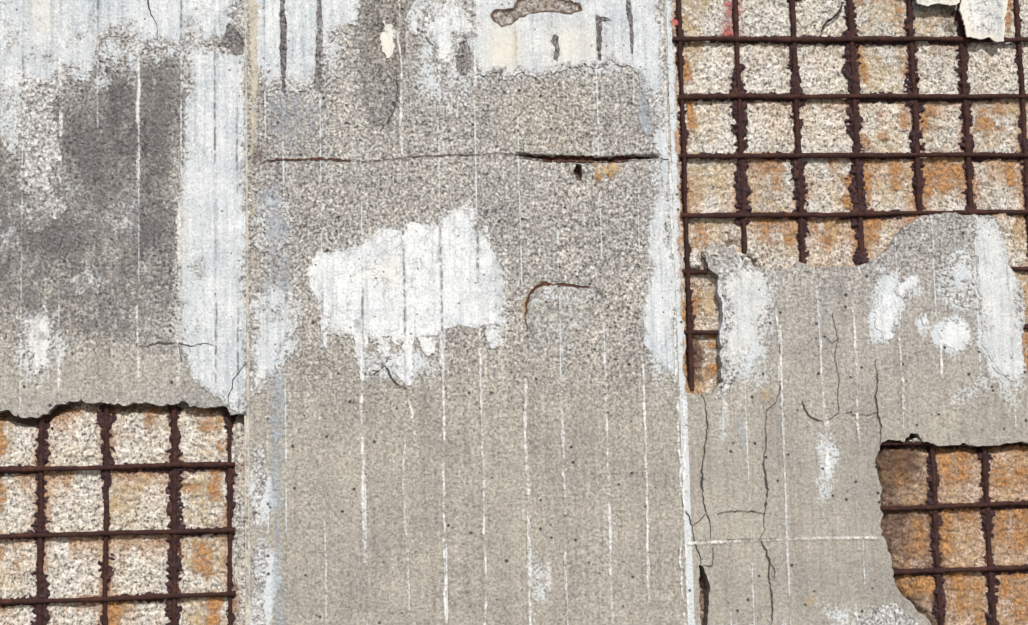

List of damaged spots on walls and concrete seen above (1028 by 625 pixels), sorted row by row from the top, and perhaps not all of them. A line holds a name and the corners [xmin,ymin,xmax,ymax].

water stain [0,47,179,390]
rust [672,19,701,154]
spalling [670,0,1028,402]
rust [827,103,939,209]
rust [923,149,963,197]
spalling [0,0,676,625]
rust [683,329,719,388]
rust [101,601,126,625]
crack [681,313,882,624]
rust [894,446,985,625]
spalling [853,434,1028,625]
rust [994,507,1028,622]